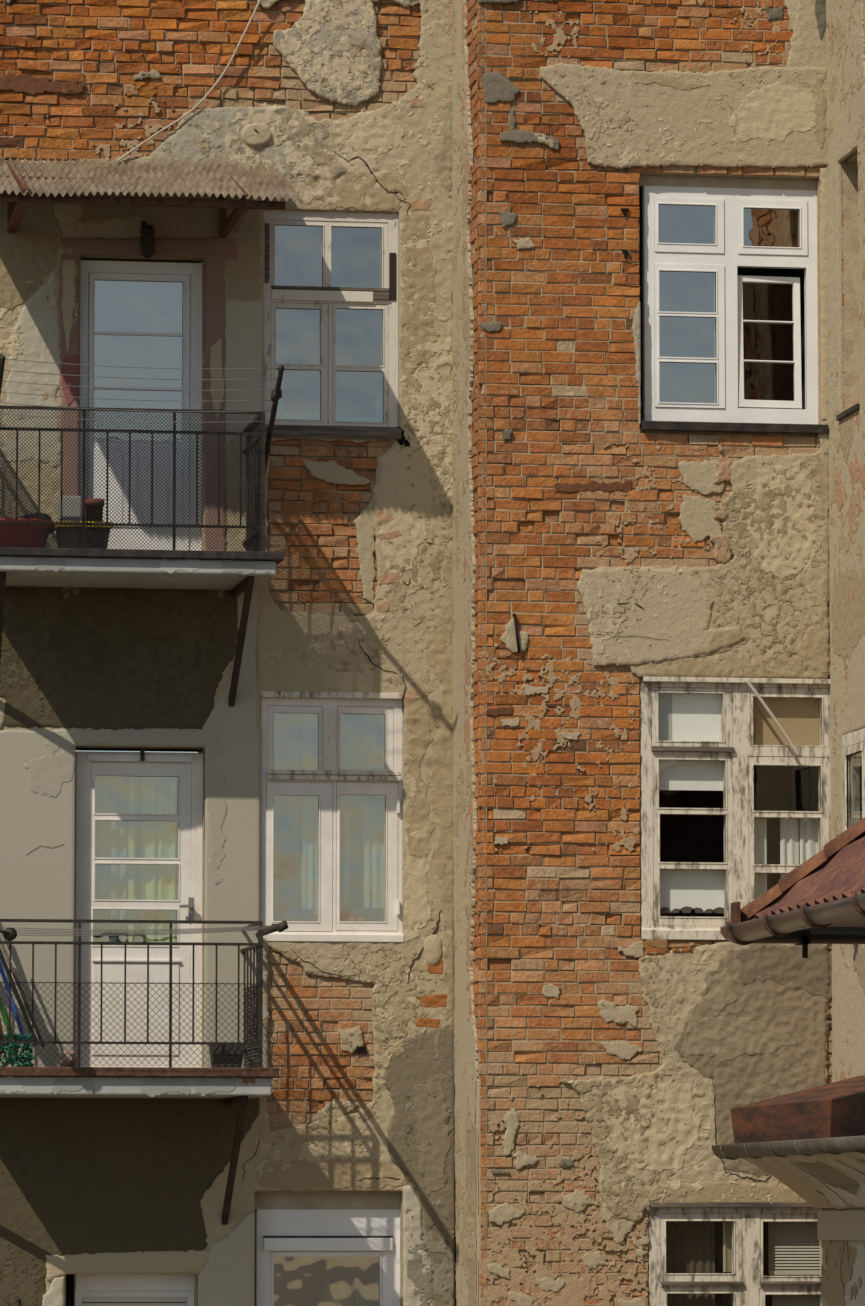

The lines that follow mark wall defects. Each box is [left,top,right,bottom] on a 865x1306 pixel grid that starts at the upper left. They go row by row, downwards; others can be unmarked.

crack [334,151,411,213]
flaking render [643,940,694,955]